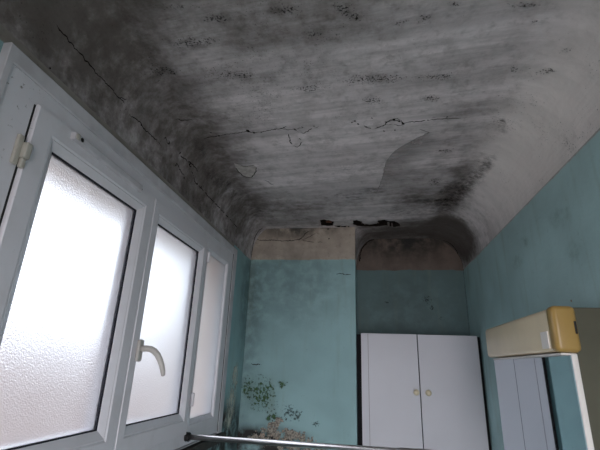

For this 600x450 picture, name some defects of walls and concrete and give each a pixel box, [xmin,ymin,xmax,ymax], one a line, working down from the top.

crack [57,26,126,102]
crack [204,126,319,147]
crack [351,117,459,132]
crack [132,116,237,227]
spalling [319,219,401,227]
damp [225,365,288,427]